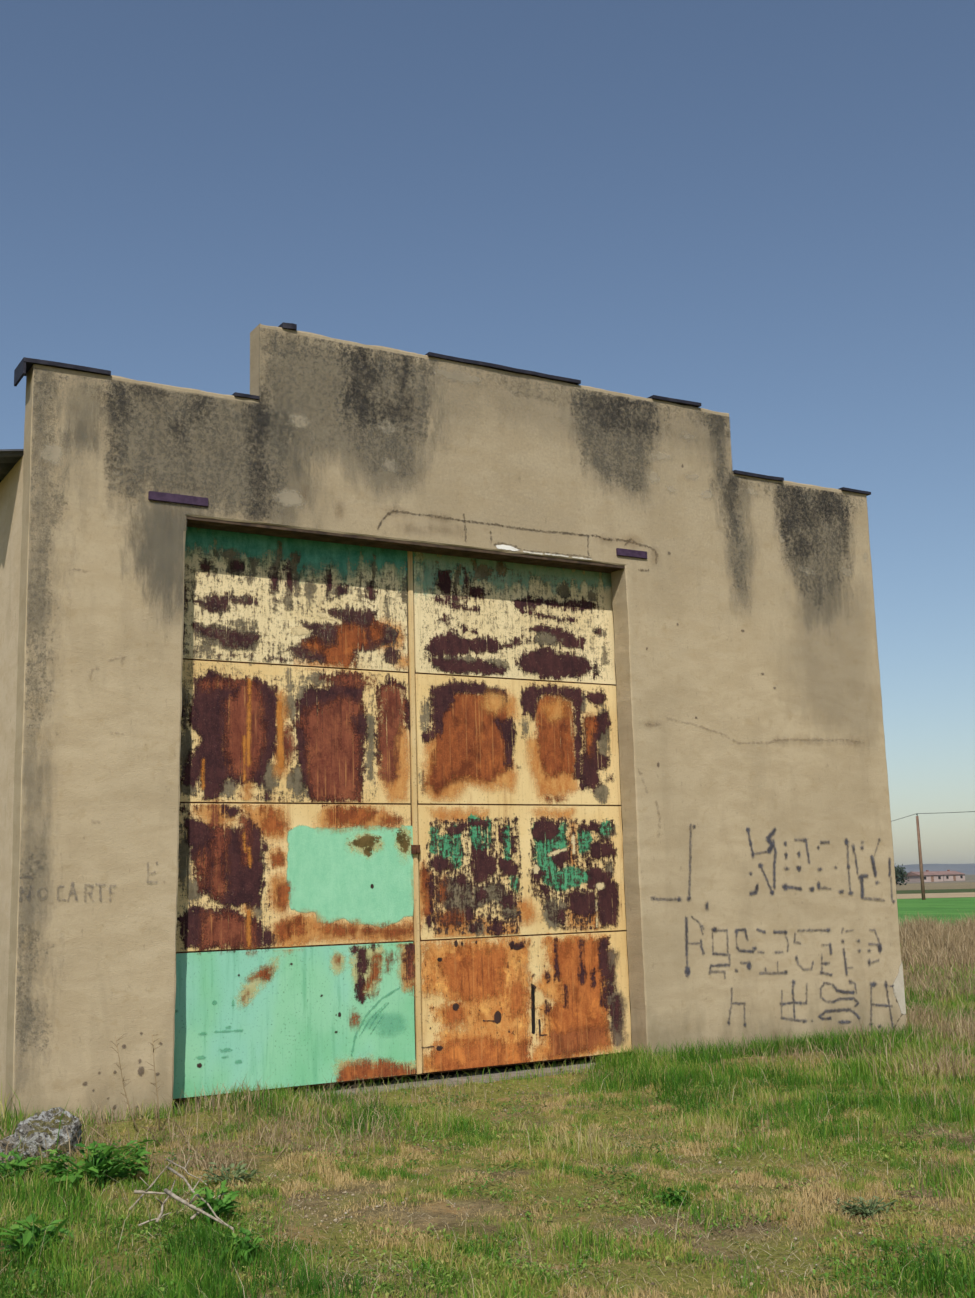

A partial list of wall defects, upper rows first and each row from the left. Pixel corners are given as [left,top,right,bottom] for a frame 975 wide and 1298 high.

damp [347,347,412,423]
damp [571,392,658,491]
damp [779,483,849,605]
rust [176,605,614,1082]
peeling [183,541,625,1046]